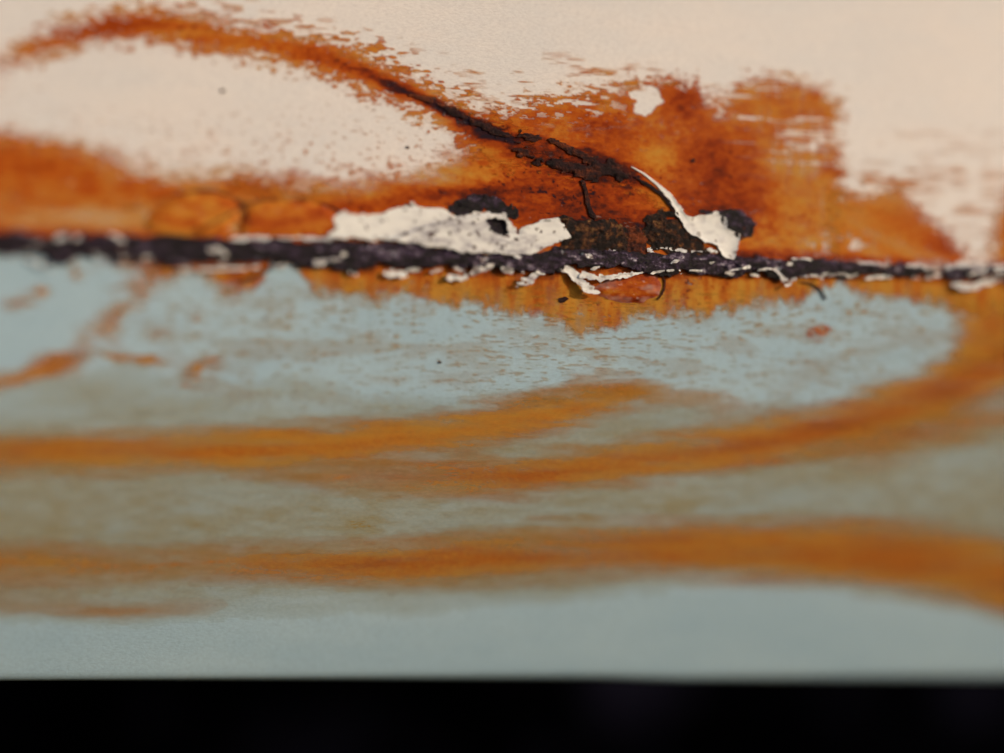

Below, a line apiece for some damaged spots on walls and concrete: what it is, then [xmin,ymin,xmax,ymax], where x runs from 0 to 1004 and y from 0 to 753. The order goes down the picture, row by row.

crack [409,94,680,220]
peeling [180,247,260,272]
corrosion [0,0,1004,493]
peeling [230,166,892,294]
peeling [906,261,1004,292]
corrosion [0,519,1004,611]